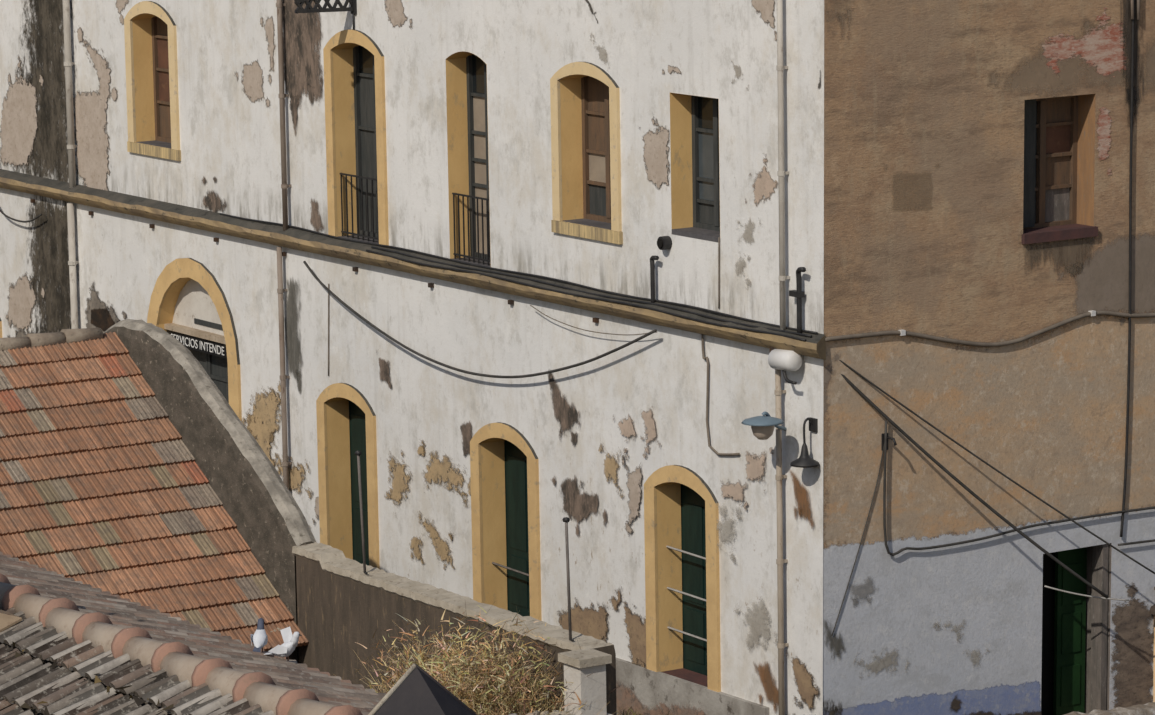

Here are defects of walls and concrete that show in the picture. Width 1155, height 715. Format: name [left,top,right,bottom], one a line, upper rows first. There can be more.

peeling [0,56,44,171]
leakage [13,0,78,182]
peeling [73,27,117,191]
leakage [282,0,323,134]
spalling [1042,7,1127,77]
leakage [1123,0,1144,127]
leakage [27,195,79,333]
peeling [241,381,319,524]
peeling [384,421,472,507]
peeling [552,475,607,536]
peeling [599,409,660,535]
peeling [557,586,646,668]